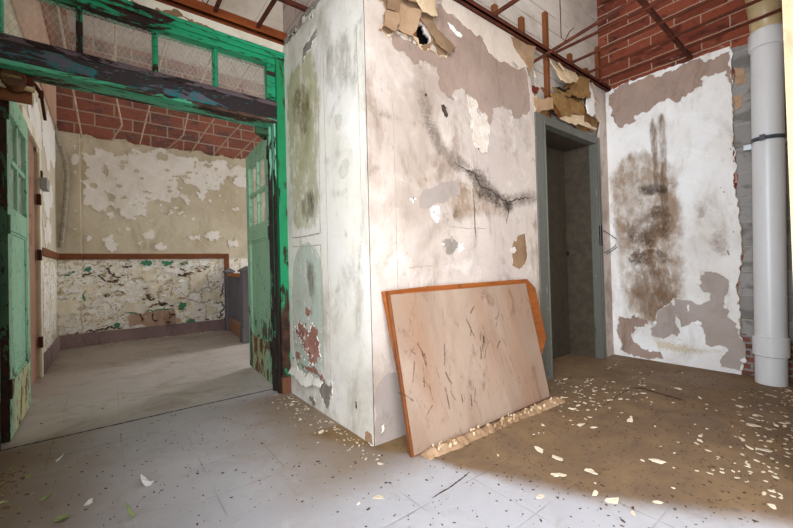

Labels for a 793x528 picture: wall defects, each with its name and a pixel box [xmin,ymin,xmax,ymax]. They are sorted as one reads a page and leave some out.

peeling [378,0,602,132]
peeling [71,145,256,252]
peeling [419,180,461,209]
peeling [441,236,465,255]
crack [452,154,532,236]
peeling [510,234,527,269]
water stain [614,115,680,322]
flaking render [608,44,755,376]
flaking render [785,91,793,382]
peeling [42,260,225,352]
peeling [288,243,333,411]